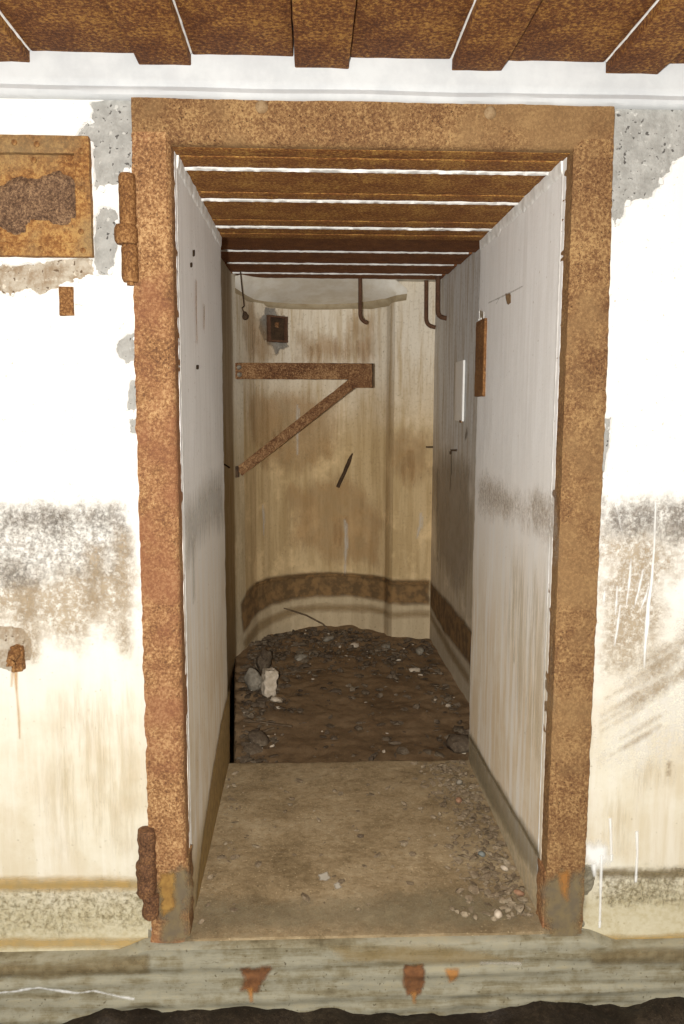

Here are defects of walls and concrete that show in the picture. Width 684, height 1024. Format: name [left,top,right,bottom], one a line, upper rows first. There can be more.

rust [0,171,76,235]
spalling [0,100,132,298]
spalling [611,109,684,227]
water stain [0,507,129,658]
water stain [241,573,472,679]
water stain [603,504,684,670]
rust [536,858,546,928]
rust [240,967,271,998]
rust [403,964,425,1000]